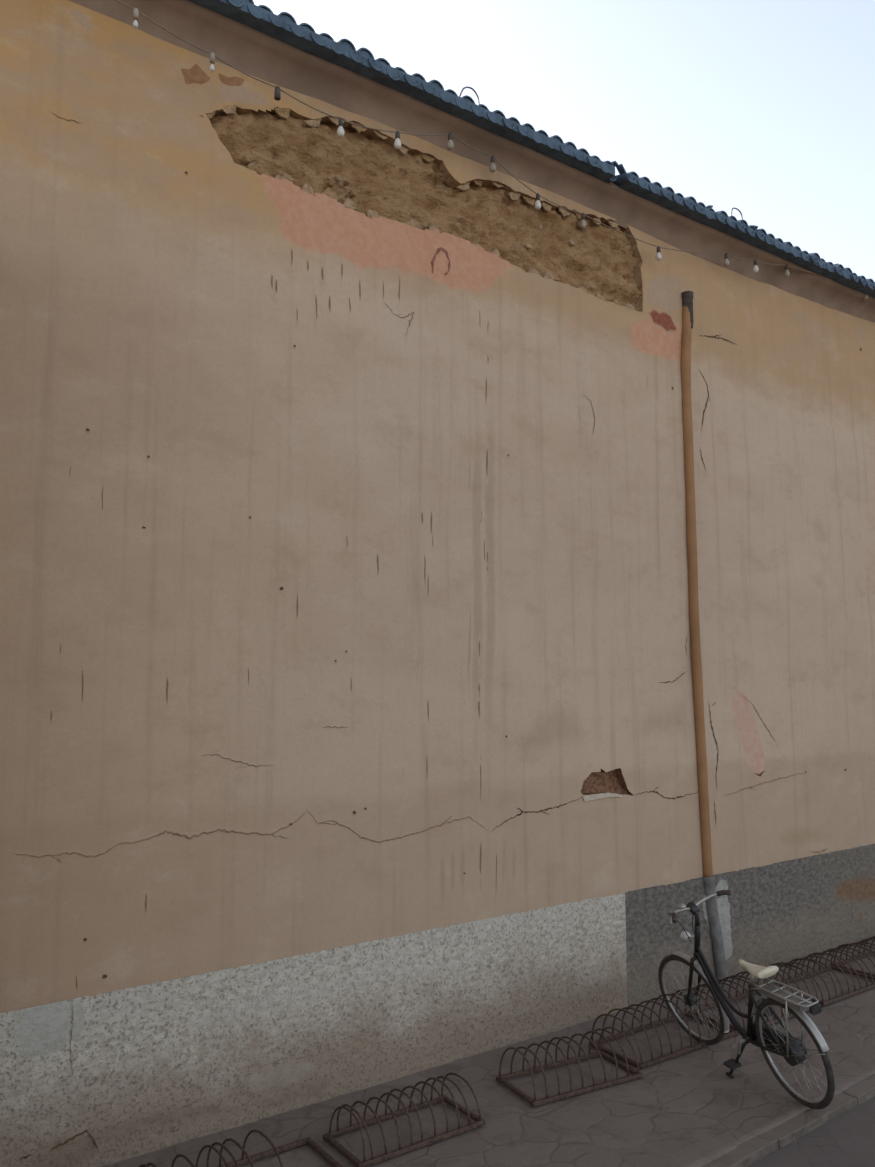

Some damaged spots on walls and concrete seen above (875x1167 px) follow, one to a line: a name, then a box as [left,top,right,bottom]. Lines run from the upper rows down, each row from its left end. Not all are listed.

peeling [179,62,246,87]
flaking render [199,105,687,366]
crack [200,753,275,769]
spalling [581,768,633,801]
crack [15,797,580,861]